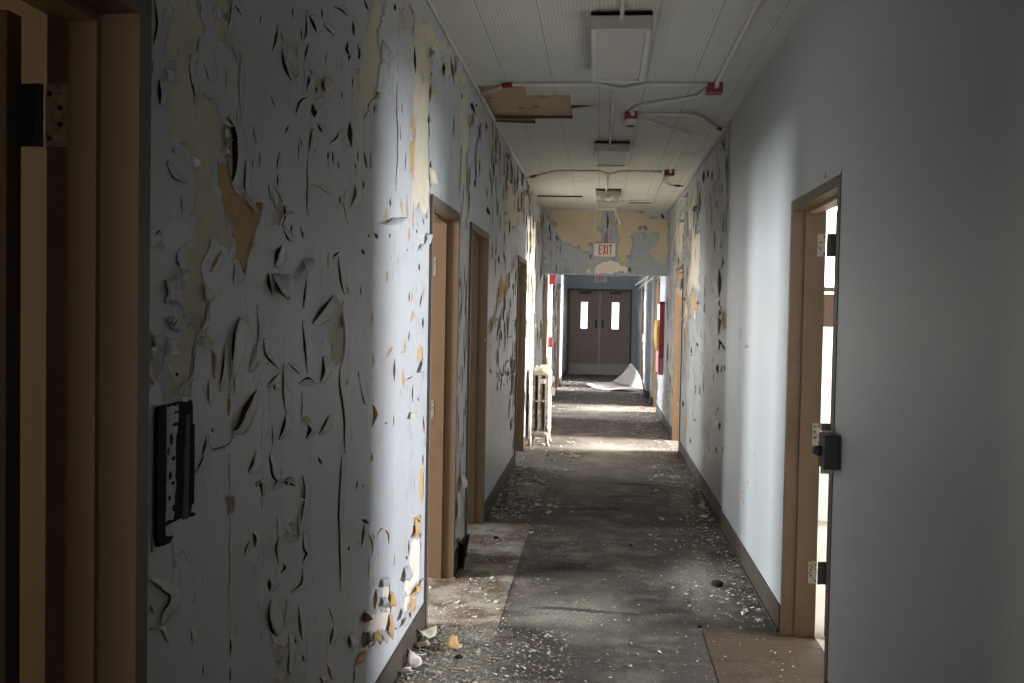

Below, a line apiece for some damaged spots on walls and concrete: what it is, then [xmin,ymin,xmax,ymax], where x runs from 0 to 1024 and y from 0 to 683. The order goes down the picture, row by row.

peeling [149,0,391,592]
peeling [456,263,470,540]
peeling [296,0,728,458]
peeling [248,452,314,678]
peeling [330,466,425,668]